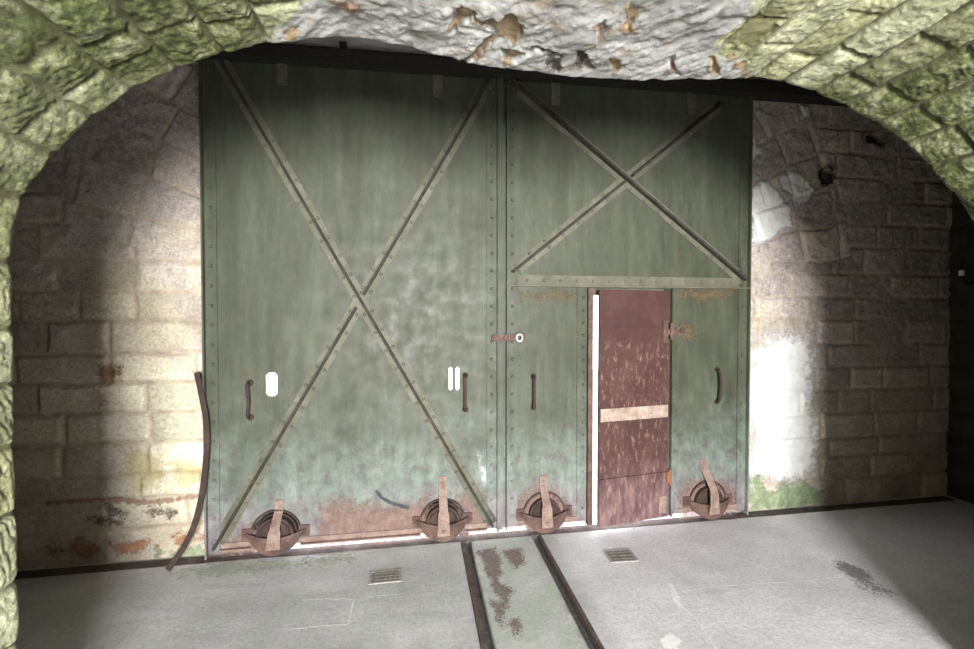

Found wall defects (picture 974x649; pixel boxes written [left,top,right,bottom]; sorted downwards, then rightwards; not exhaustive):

flaking render [449,7,522,65]
flaking render [531,46,563,72]
flaking render [574,22,608,68]
flaking render [606,58,624,74]
peeling [753,136,762,160]
peeling [752,165,837,244]
corrosion [99,364,124,386]
corrosion [46,495,196,506]
corrosion [454,494,484,534]
damp [749,475,824,511]
corrosion [47,536,159,558]
corrosion [476,546,527,638]